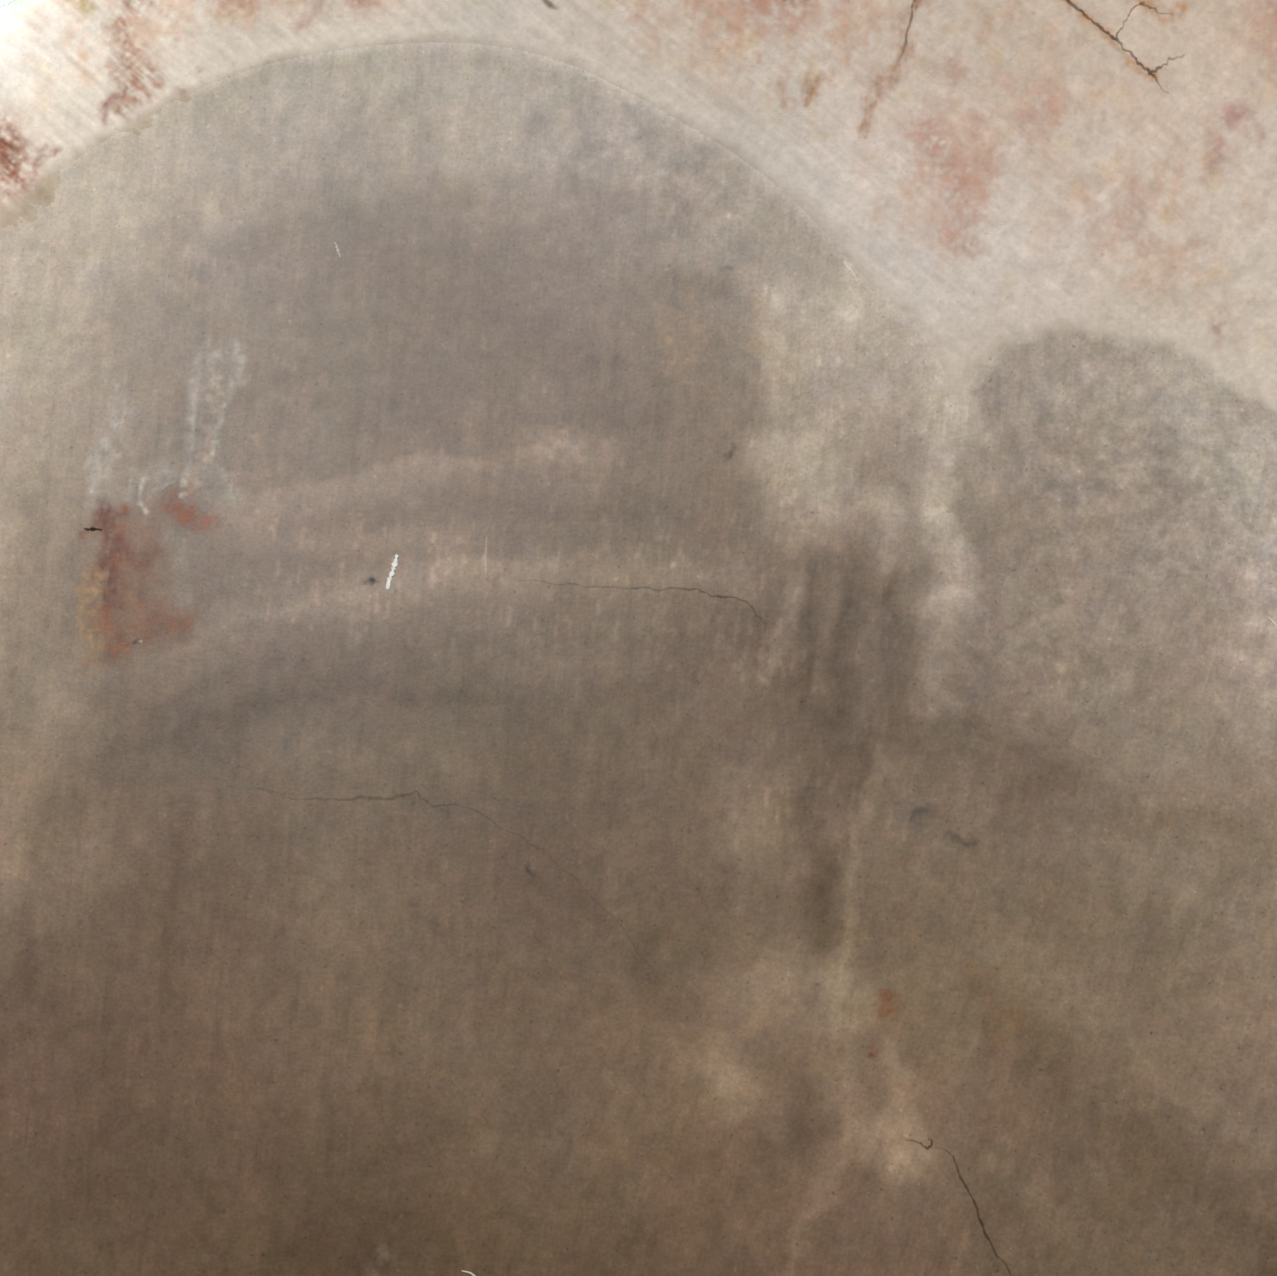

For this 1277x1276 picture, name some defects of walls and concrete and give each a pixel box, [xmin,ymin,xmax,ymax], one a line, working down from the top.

crack [849,0,936,145]
crack [1053,0,1198,89]
corrosion [64,478,231,683]